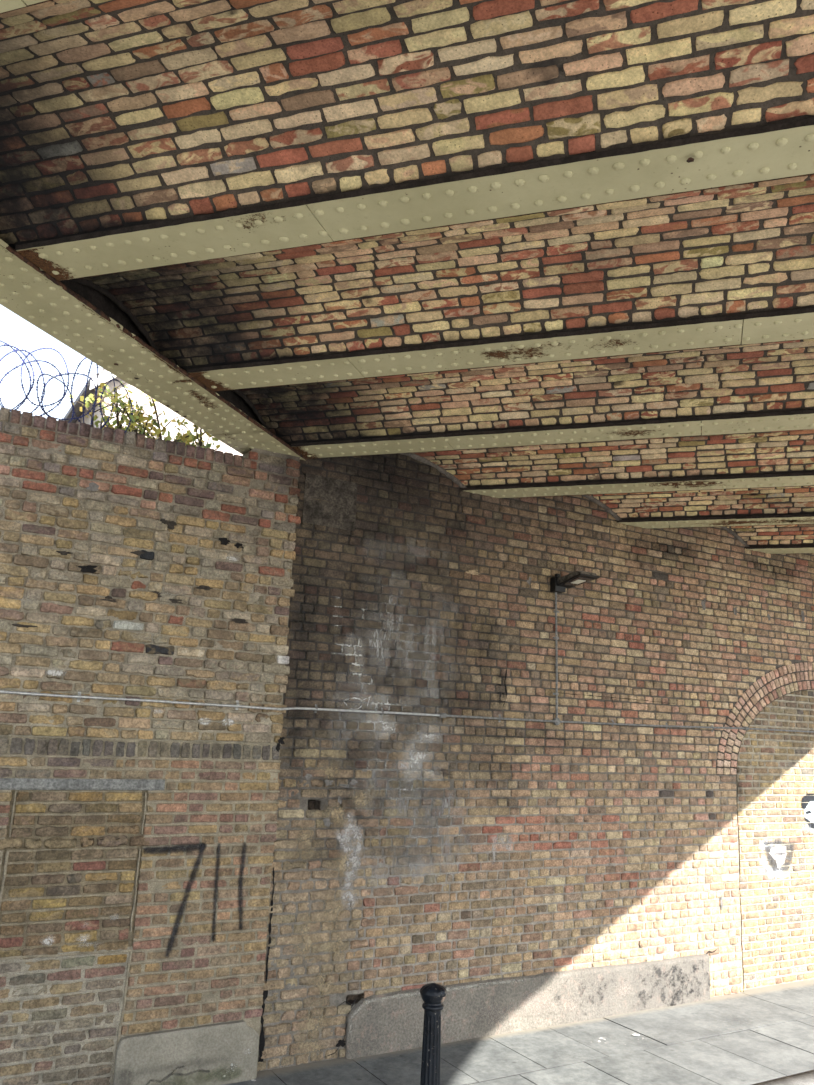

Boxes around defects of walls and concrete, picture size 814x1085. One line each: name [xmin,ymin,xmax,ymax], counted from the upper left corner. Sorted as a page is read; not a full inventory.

rust [6,248,73,283]
rust [481,341,571,362]
damp [369,597,410,667]
damp [337,814,362,905]